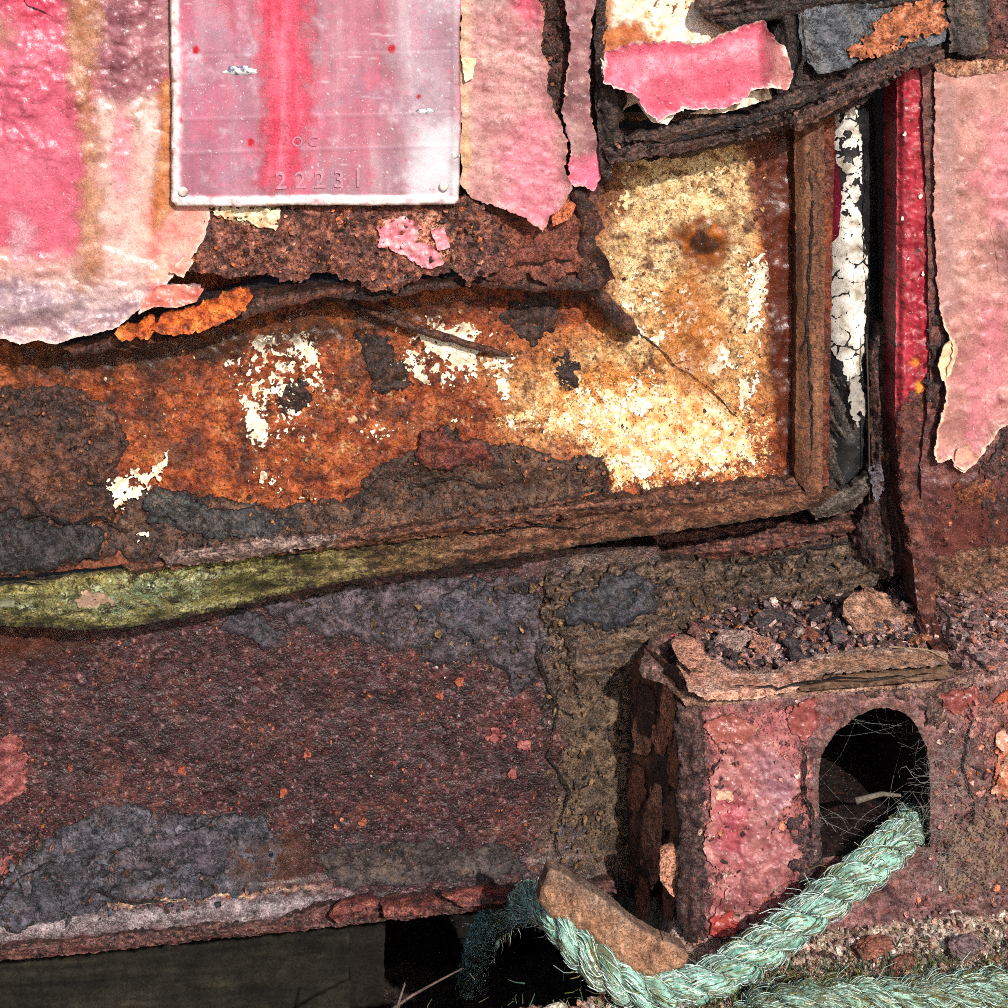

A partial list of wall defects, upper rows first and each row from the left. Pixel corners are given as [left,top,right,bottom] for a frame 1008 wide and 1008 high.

peeling [451,0,734,232]
peeling [603,20,794,125]
rust [847,0,949,61]
peeling [139,256,204,314]
peeling [224,326,326,451]
rust [114,139,803,575]
crack [638,329,738,417]
crack [860,132,872,381]
peeling [918,70,1008,595]